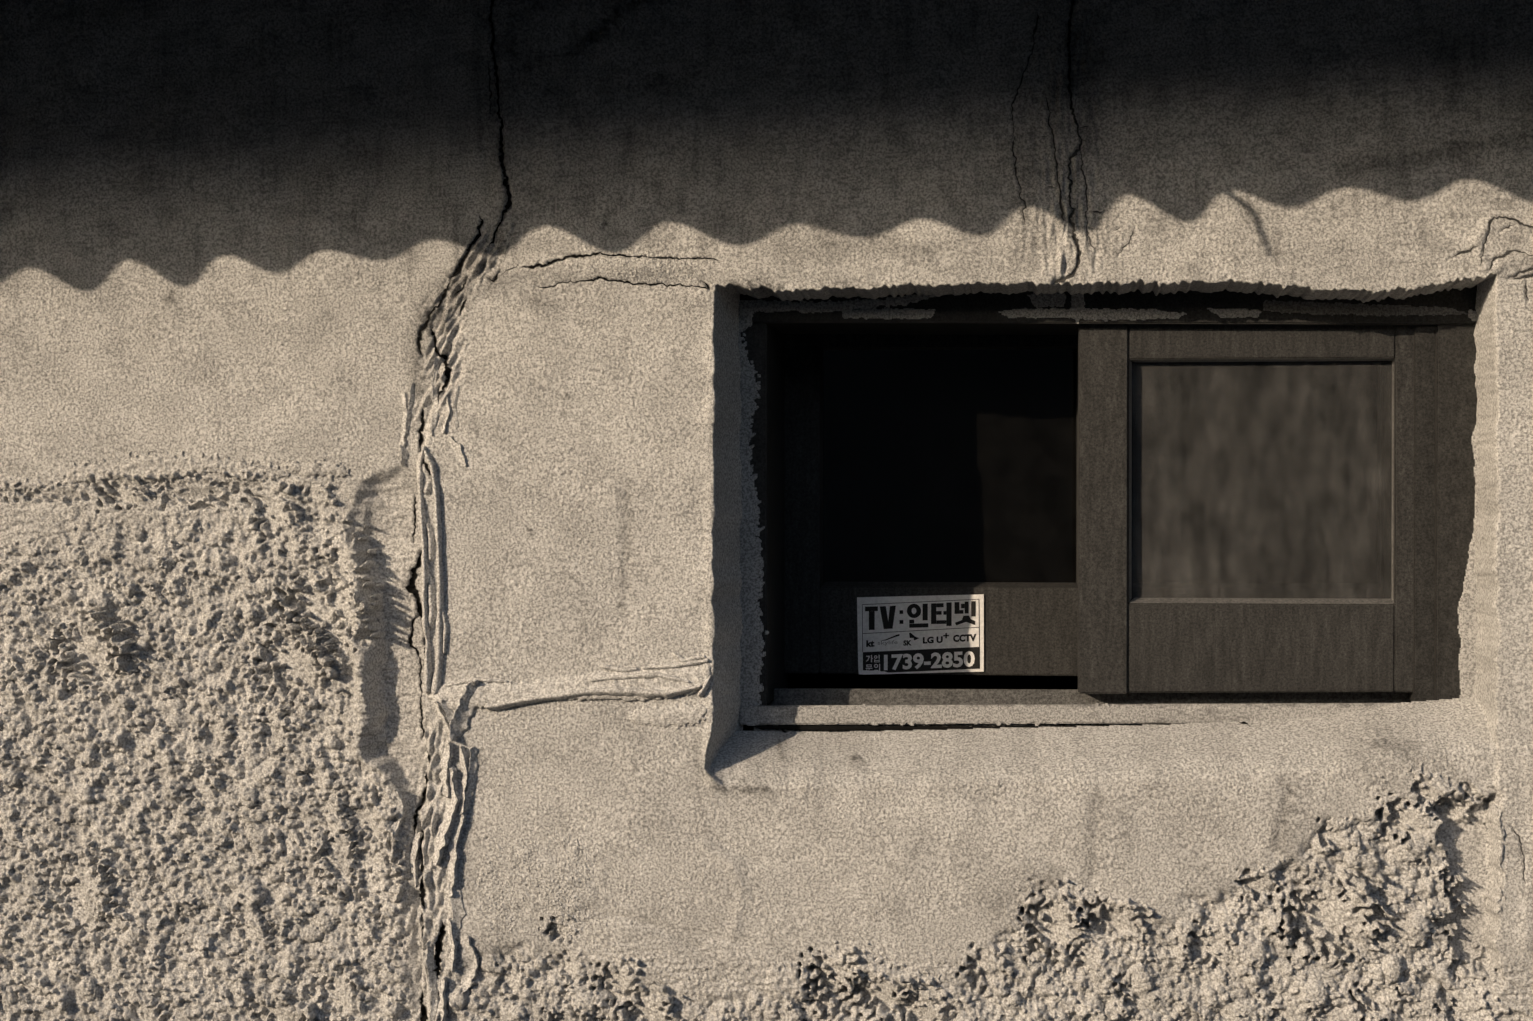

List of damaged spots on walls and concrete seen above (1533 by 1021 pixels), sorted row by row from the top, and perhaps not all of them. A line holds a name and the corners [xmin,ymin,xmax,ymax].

crack [1011,0,1135,284]
crack [1451,216,1533,300]
spalling [0,450,351,496]
crack [405,0,720,1021]
spalling [1315,803,1393,835]
spalling [1015,885,1137,913]
spalling [1238,857,1292,884]
spalling [1404,763,1506,936]
spalling [764,948,942,1008]